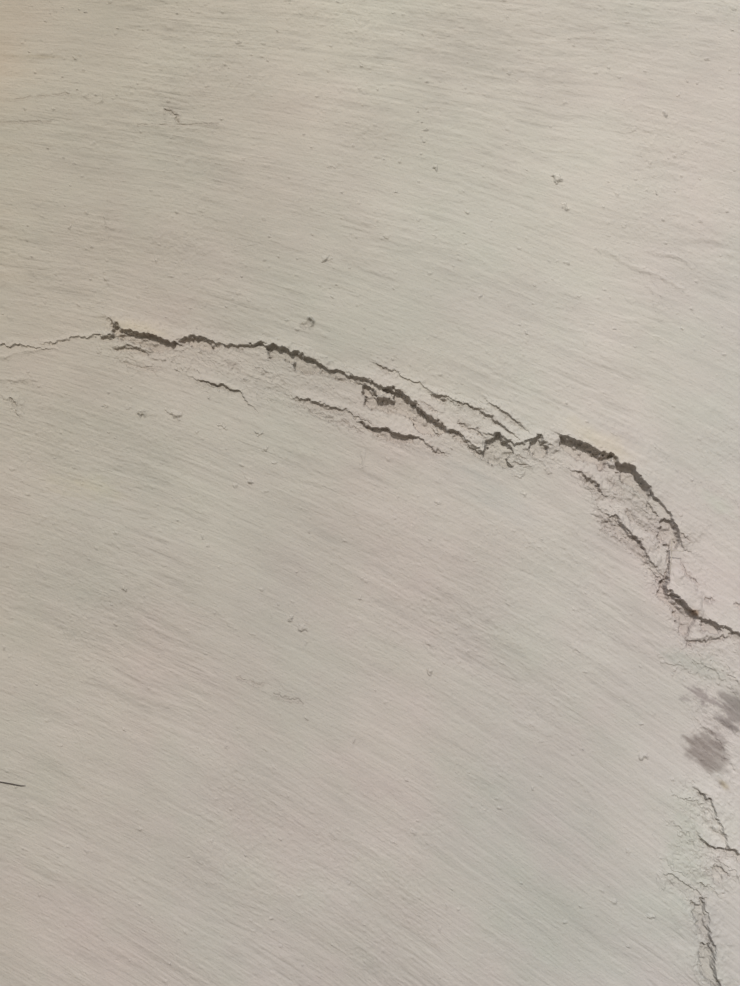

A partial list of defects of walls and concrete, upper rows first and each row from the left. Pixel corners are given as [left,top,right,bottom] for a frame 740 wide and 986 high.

crack [0,89,105,125]
crack [0,304,740,693]
crack [657,715,740,986]